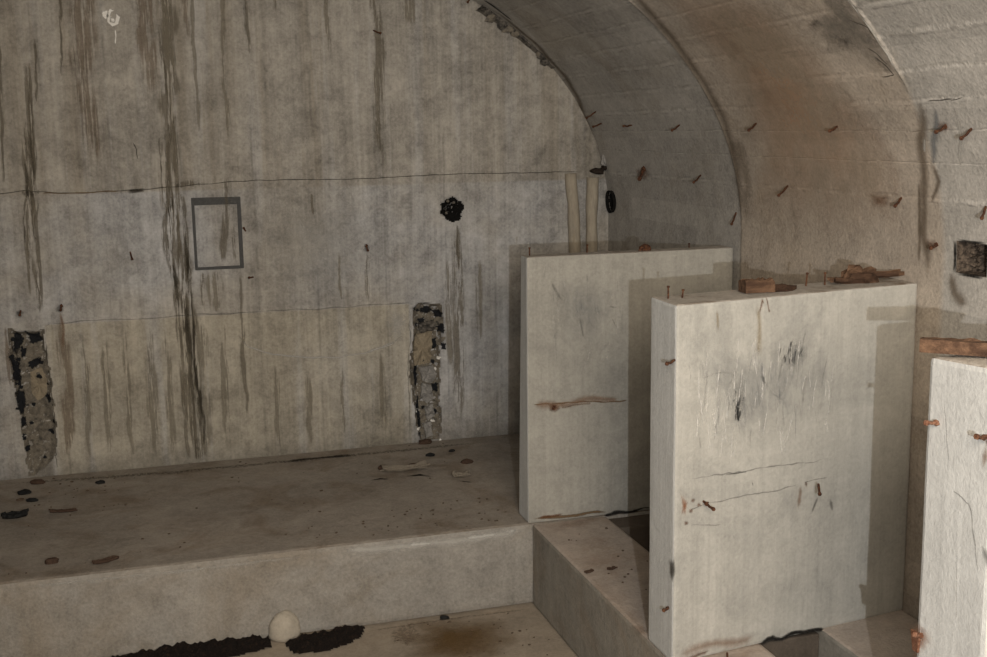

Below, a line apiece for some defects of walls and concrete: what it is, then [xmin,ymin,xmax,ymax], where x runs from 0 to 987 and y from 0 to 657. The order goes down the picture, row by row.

damp [22,43,43,306]
damp [148,0,218,457]
damp [220,185,235,257]
spalling [7,328,57,476]
damp [240,280,394,421]
spalling [409,303,446,441]